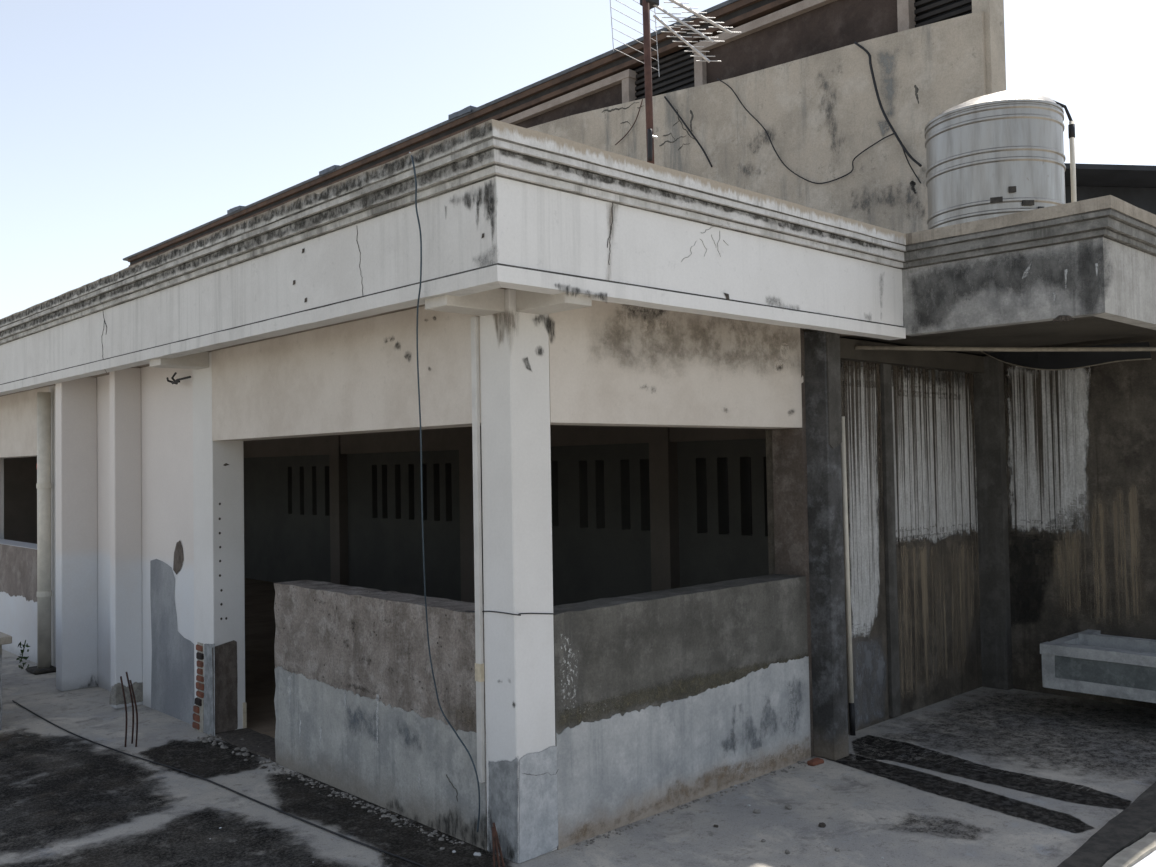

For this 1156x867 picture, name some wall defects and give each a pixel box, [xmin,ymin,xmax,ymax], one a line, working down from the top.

leakage [0,126,494,337]
leakage [500,150,889,250]
crack [681,226,728,262]
leakage [555,284,607,300]
leakage [912,246,1110,327]
leakage [524,316,555,370]
leakage [608,320,747,360]
spalling [173,541,183,575]
leakage [840,360,977,693]
peeling [192,640,238,736]